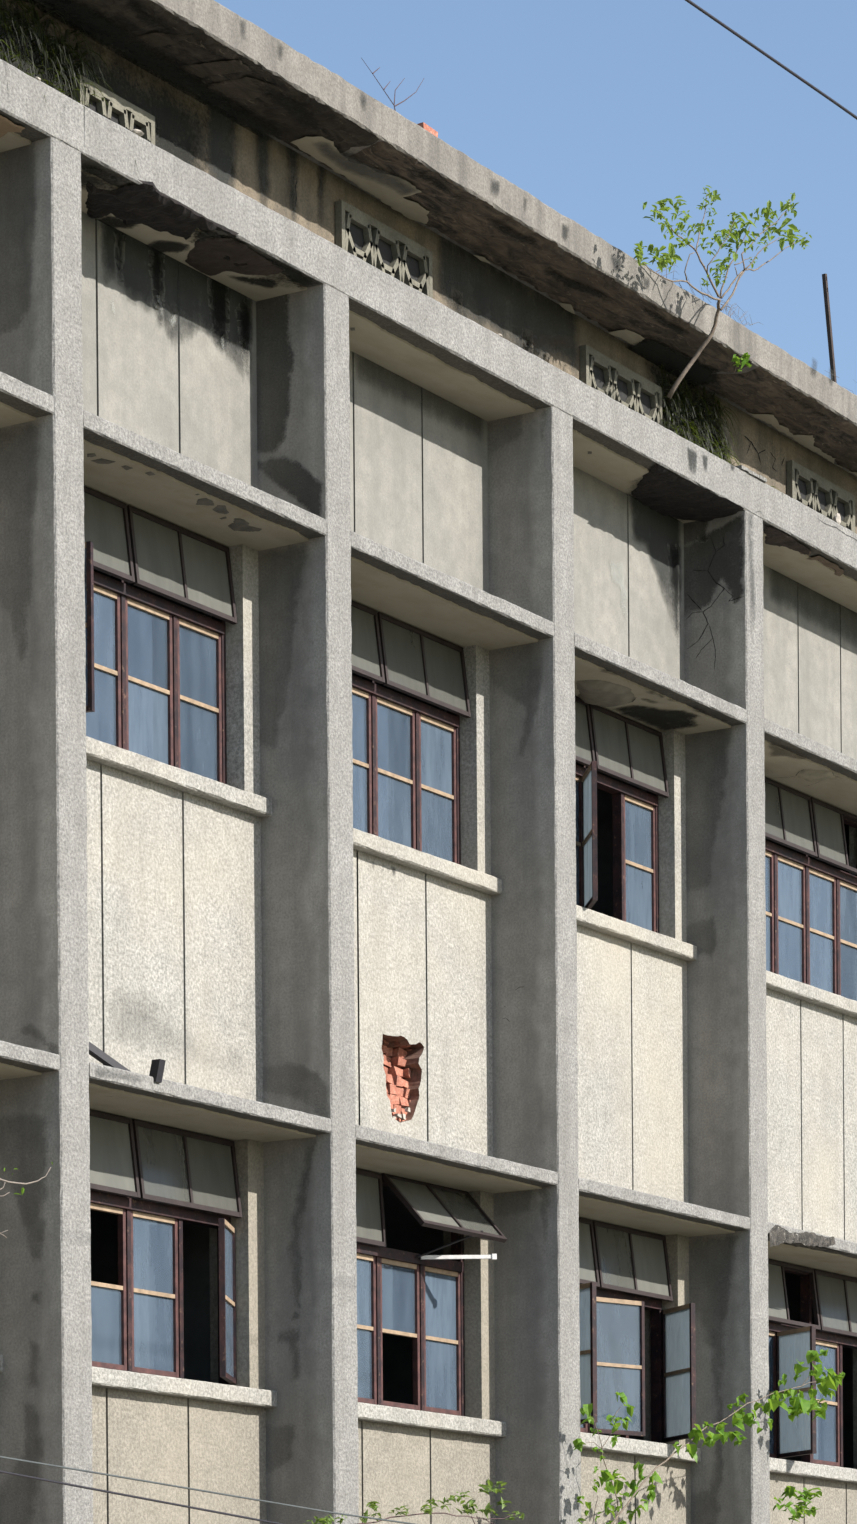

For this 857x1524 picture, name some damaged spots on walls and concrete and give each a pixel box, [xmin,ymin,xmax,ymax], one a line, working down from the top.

spalling [71,0,857,476]
water stain [97,216,322,516]
flaking render [195,494,262,532]
spalling [631,463,744,522]
crack [687,538,744,669]
spalling [382,1034,424,1123]